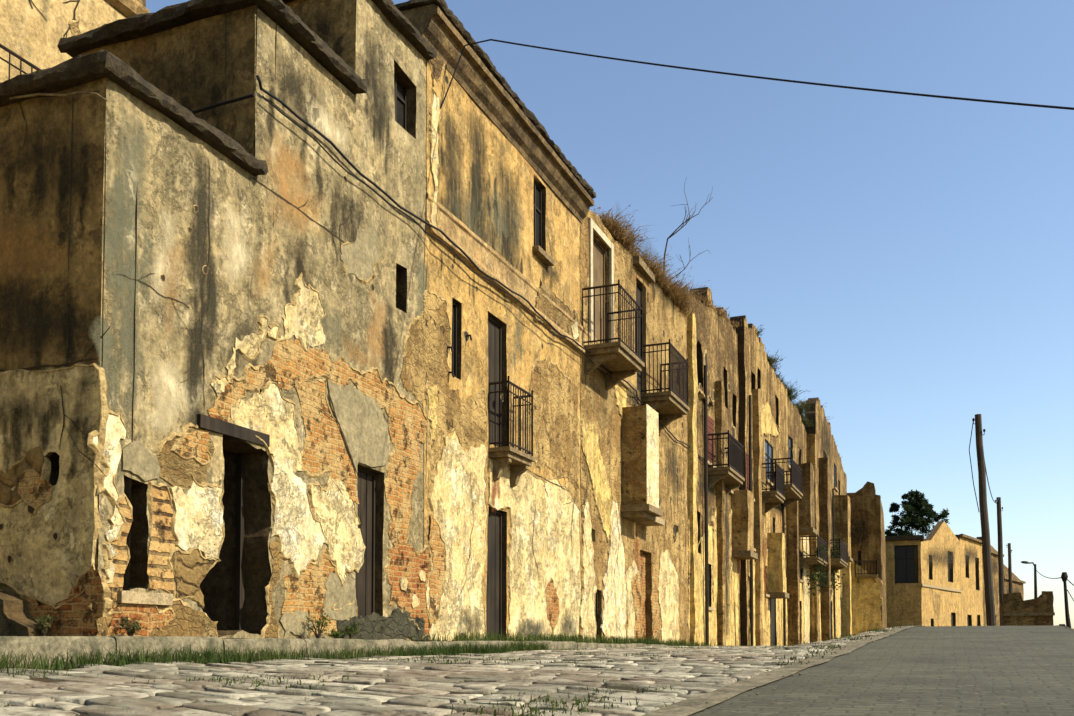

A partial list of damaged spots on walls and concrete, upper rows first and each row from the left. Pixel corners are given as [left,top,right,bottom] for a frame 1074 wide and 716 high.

flaking render [0,363,225,637]
flaking render [208,290,488,641]